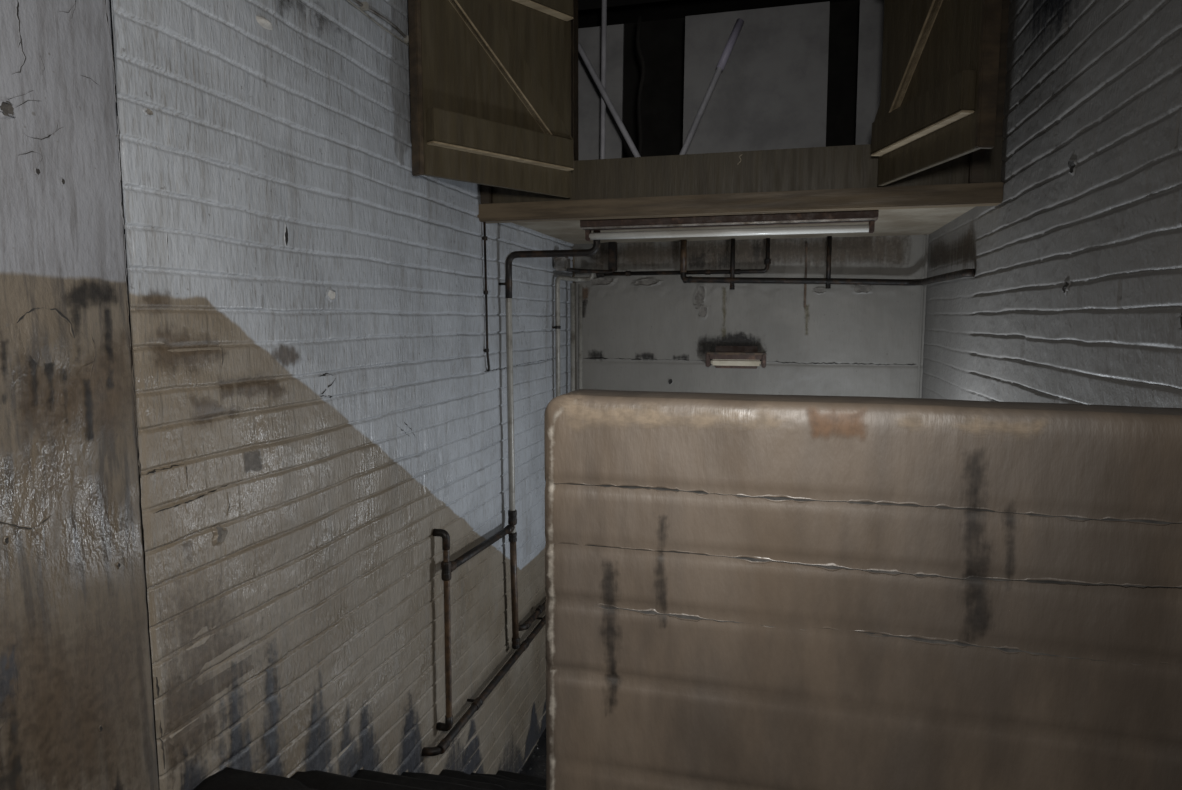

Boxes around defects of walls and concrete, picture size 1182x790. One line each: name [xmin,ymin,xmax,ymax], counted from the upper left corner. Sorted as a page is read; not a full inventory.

spalling [0,97,16,120]
damp [30,310,121,440]